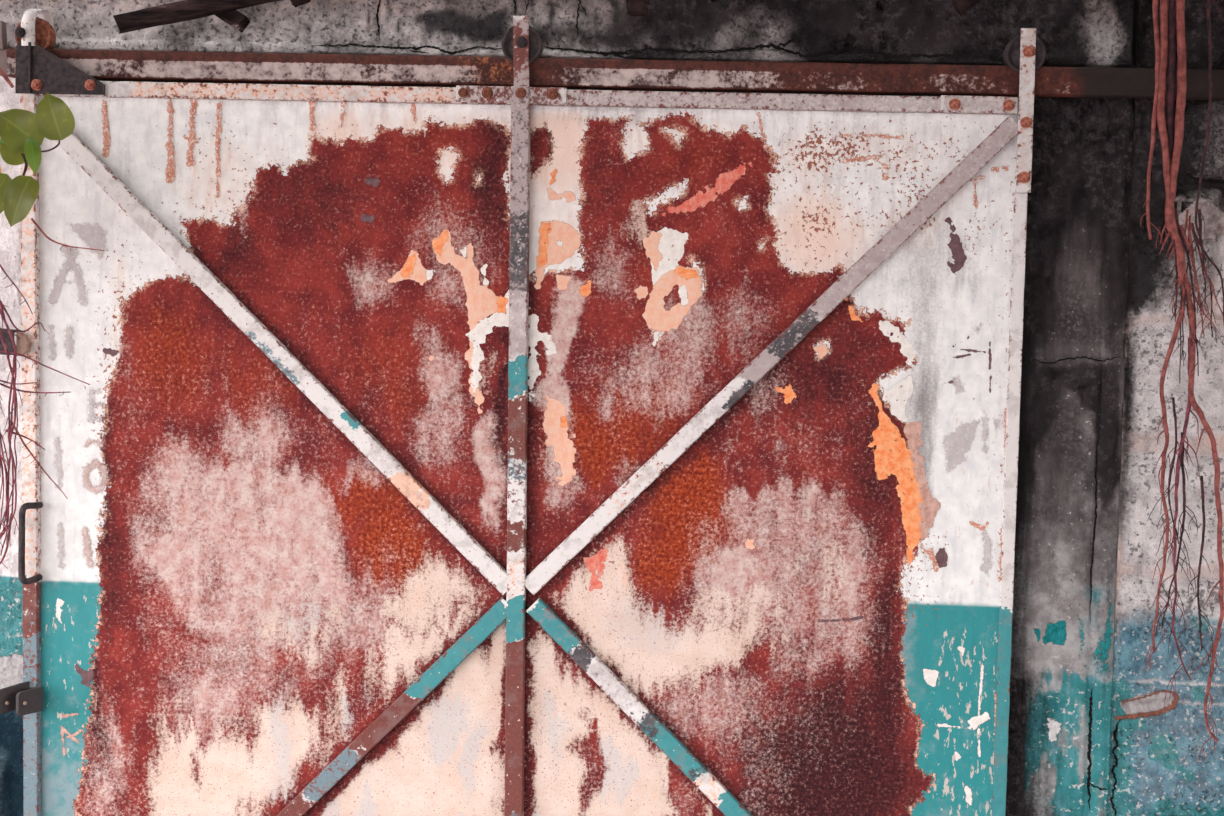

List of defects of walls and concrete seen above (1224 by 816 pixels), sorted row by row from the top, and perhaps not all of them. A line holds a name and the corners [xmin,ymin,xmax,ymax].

corrosion [165,99,199,184]
corrosion [179,101,511,571]
corrosion [524,109,941,816]
water stain [1030,348,1132,513]
corrosion [72,273,507,816]
peeling [923,669,939,687]
peeling [964,786,972,805]
peeling [968,712,990,730]
water stain [1005,677,1033,816]
water stain [1047,718,1062,742]
crack [1087,690,1120,816]
spalling [1115,690,1179,720]